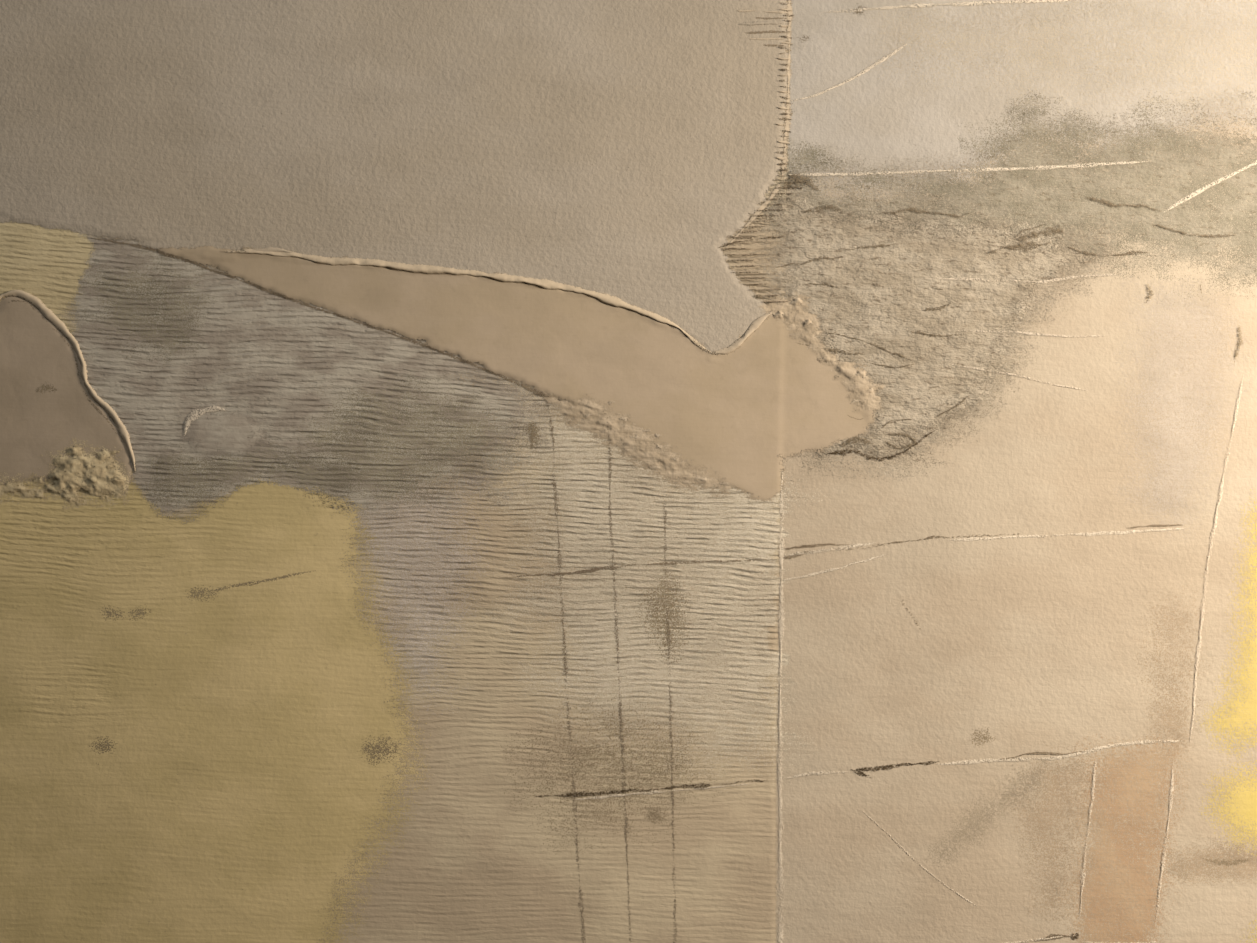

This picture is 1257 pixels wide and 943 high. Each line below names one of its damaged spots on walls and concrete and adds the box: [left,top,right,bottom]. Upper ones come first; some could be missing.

leakage [761,0,1257,305]
spalling [0,437,137,511]
spalling [538,391,739,498]
crack [517,524,1184,582]
crack [536,740,1179,800]